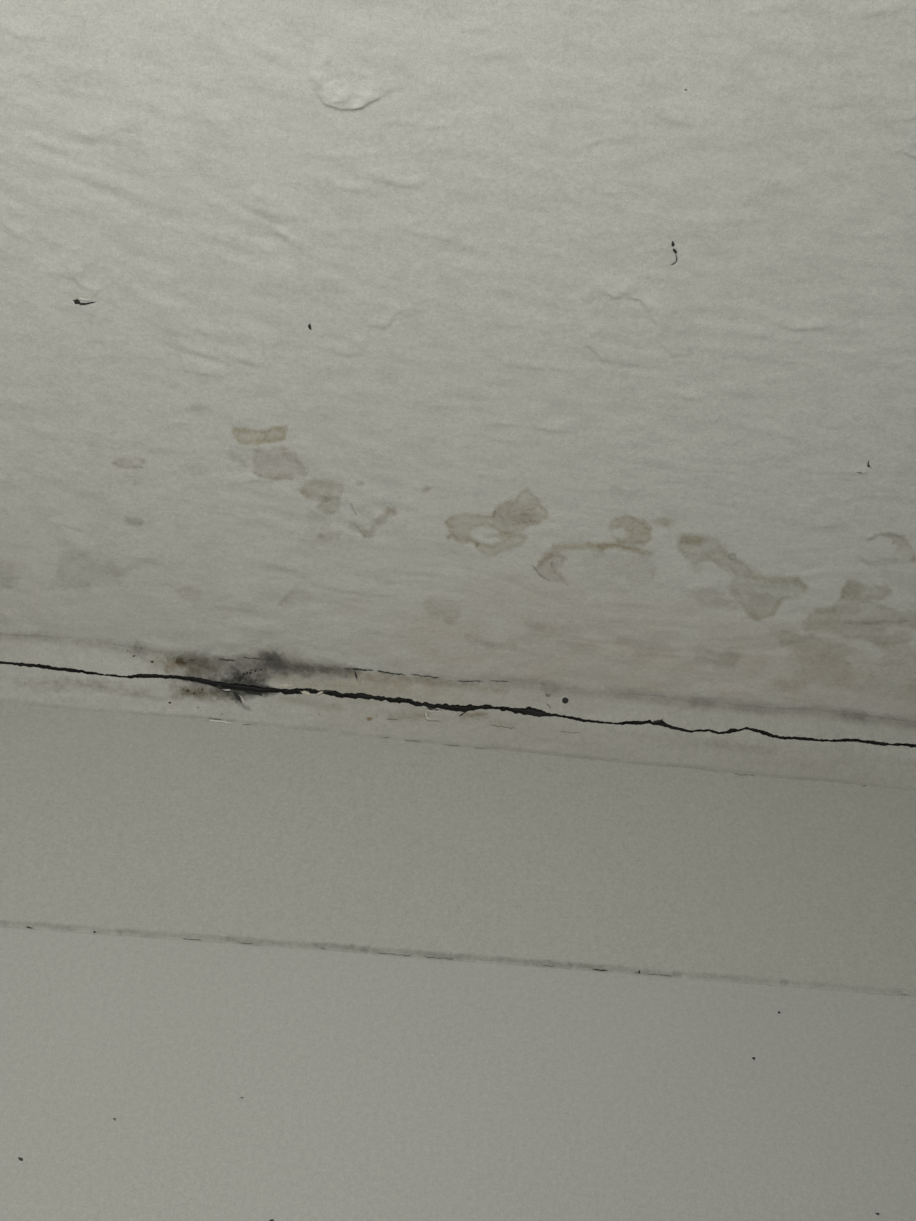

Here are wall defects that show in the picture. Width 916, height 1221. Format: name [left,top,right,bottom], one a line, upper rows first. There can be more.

crack [0,657,916,749]